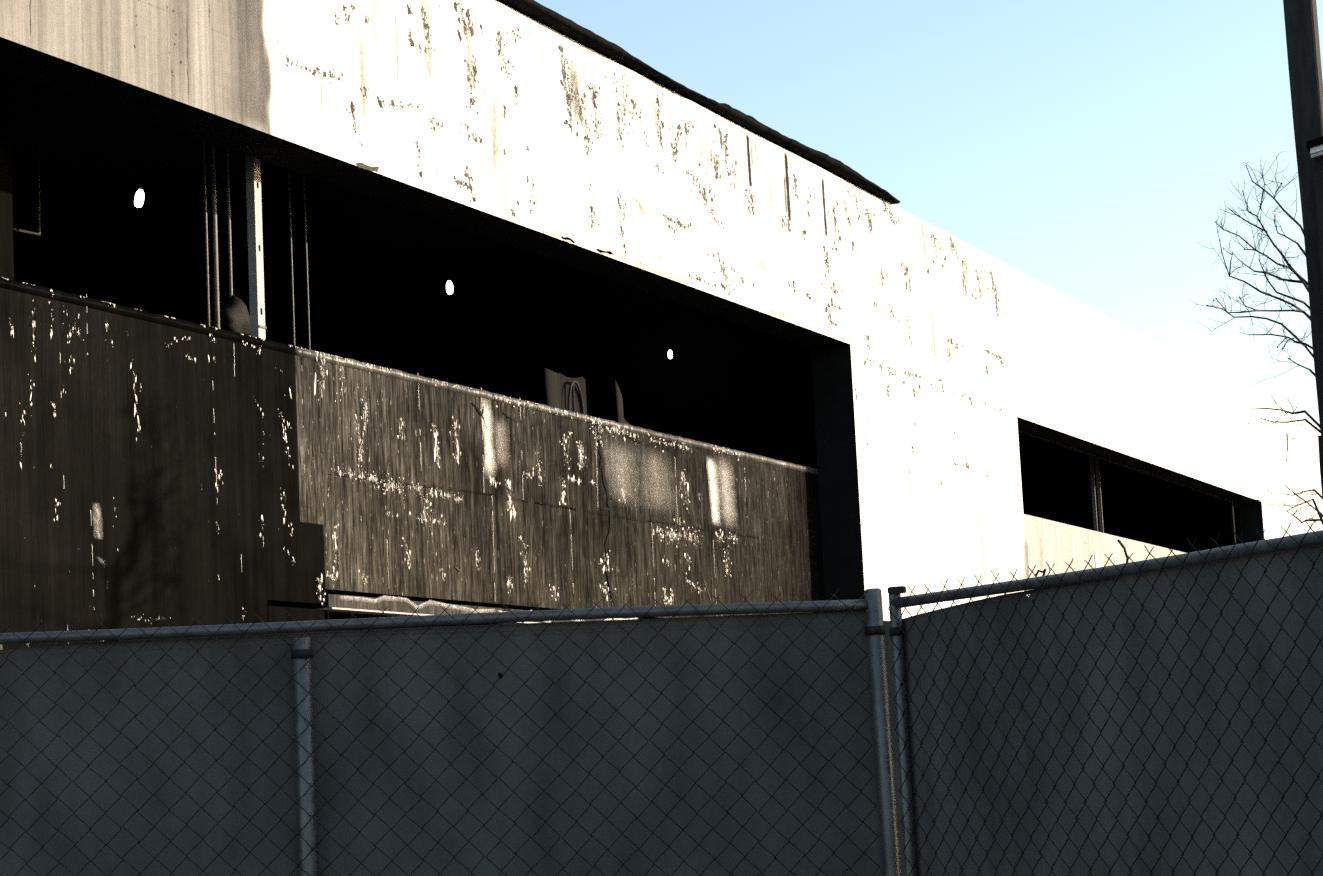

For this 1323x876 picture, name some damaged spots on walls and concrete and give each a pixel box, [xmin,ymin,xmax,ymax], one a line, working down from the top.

damp [250,0,271,122]
peeling [407,0,521,117]
peeling [346,86,420,147]
peeling [557,44,756,233]
peeling [545,231,576,245]
peeling [595,190,755,296]
peeling [782,173,899,328]
peeling [289,345,391,403]
peeling [331,399,463,525]
peeling [490,452,542,521]
peeling [491,396,692,506]
peeling [316,523,339,606]